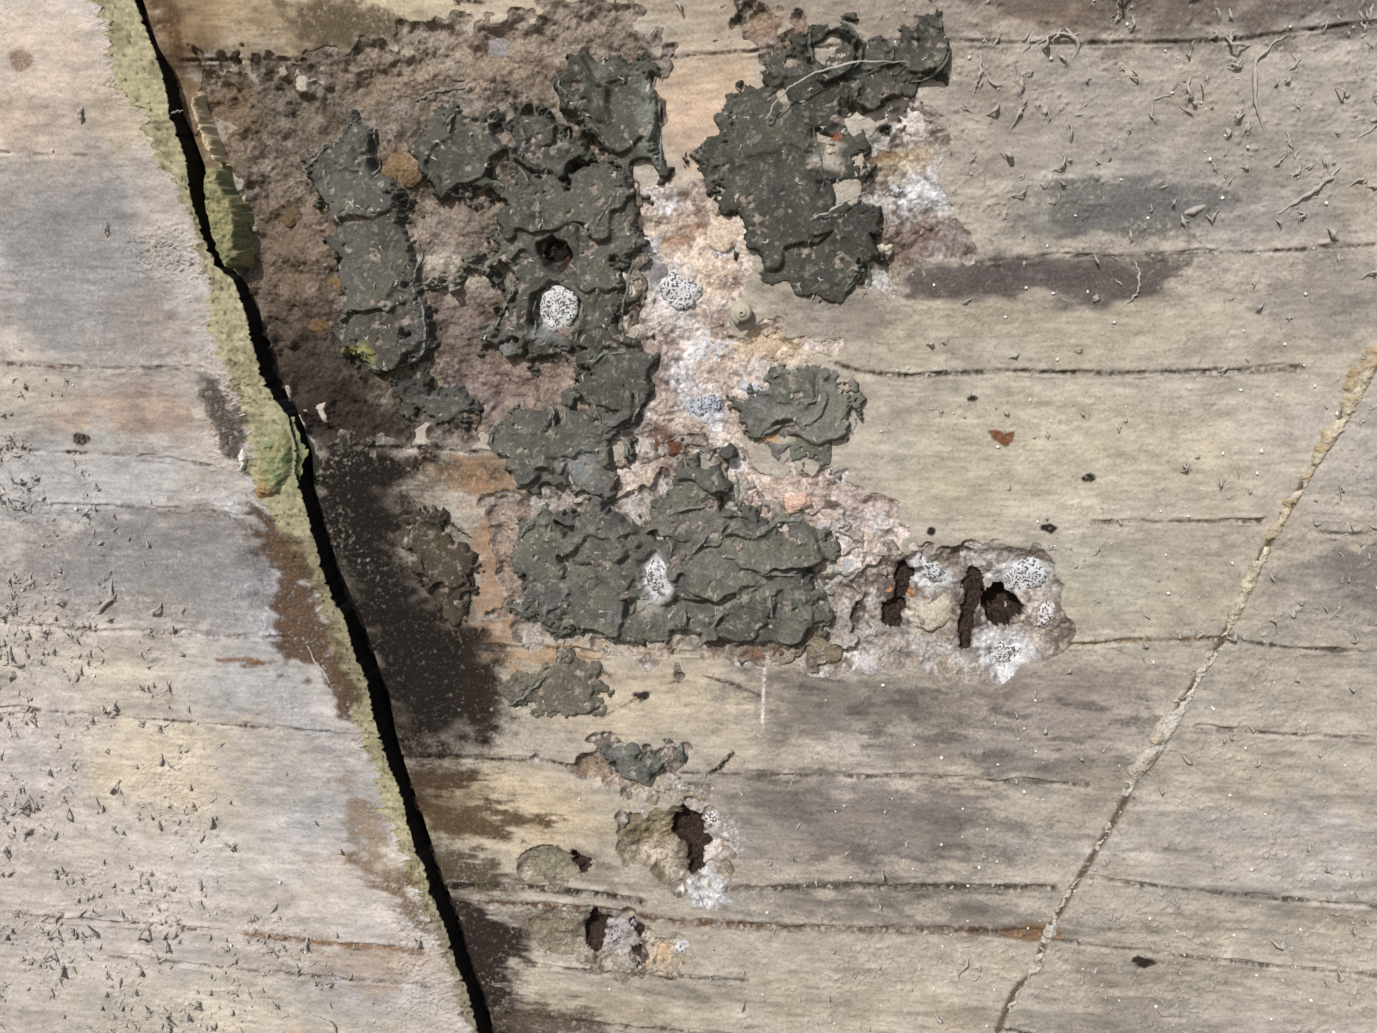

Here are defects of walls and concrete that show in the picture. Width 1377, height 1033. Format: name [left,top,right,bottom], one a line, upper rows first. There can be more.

spalling [195,0,678,458]
spalling [856,96,977,299]
water stain [904,256,1189,300]
crack [1074,250,1210,258]
crack [1246,243,1374,252]
spalling [432,159,1076,685]
water stain [192,483,359,720]
water stain [308,424,606,1033]
crack [399,754,567,765]
spalling [517,841,697,985]
spalling [566,731,737,912]
crack [444,345,1377,1033]